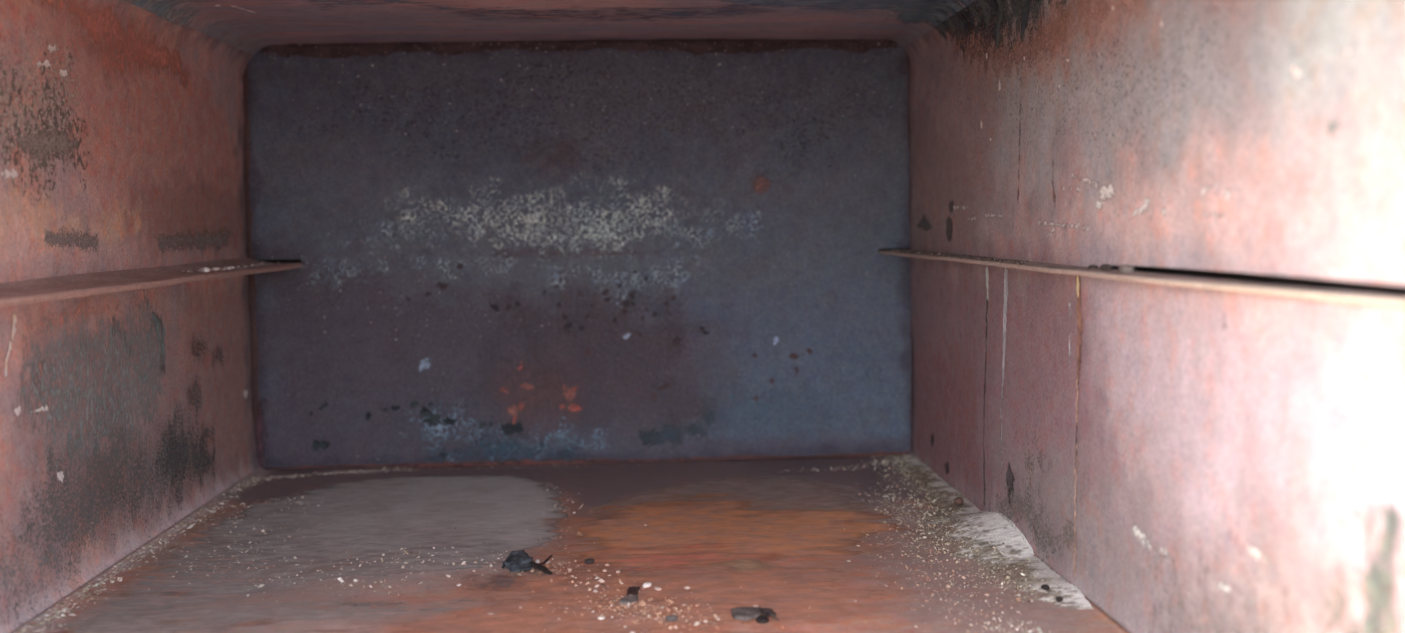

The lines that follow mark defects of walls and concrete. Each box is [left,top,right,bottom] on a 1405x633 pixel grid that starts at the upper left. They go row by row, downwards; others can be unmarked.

leakage [310,0,1075,62]
leakage [299,174,763,306]
leakage [4,313,17,377]
leakage [0,337,223,624]
corrosion [398,494,905,633]